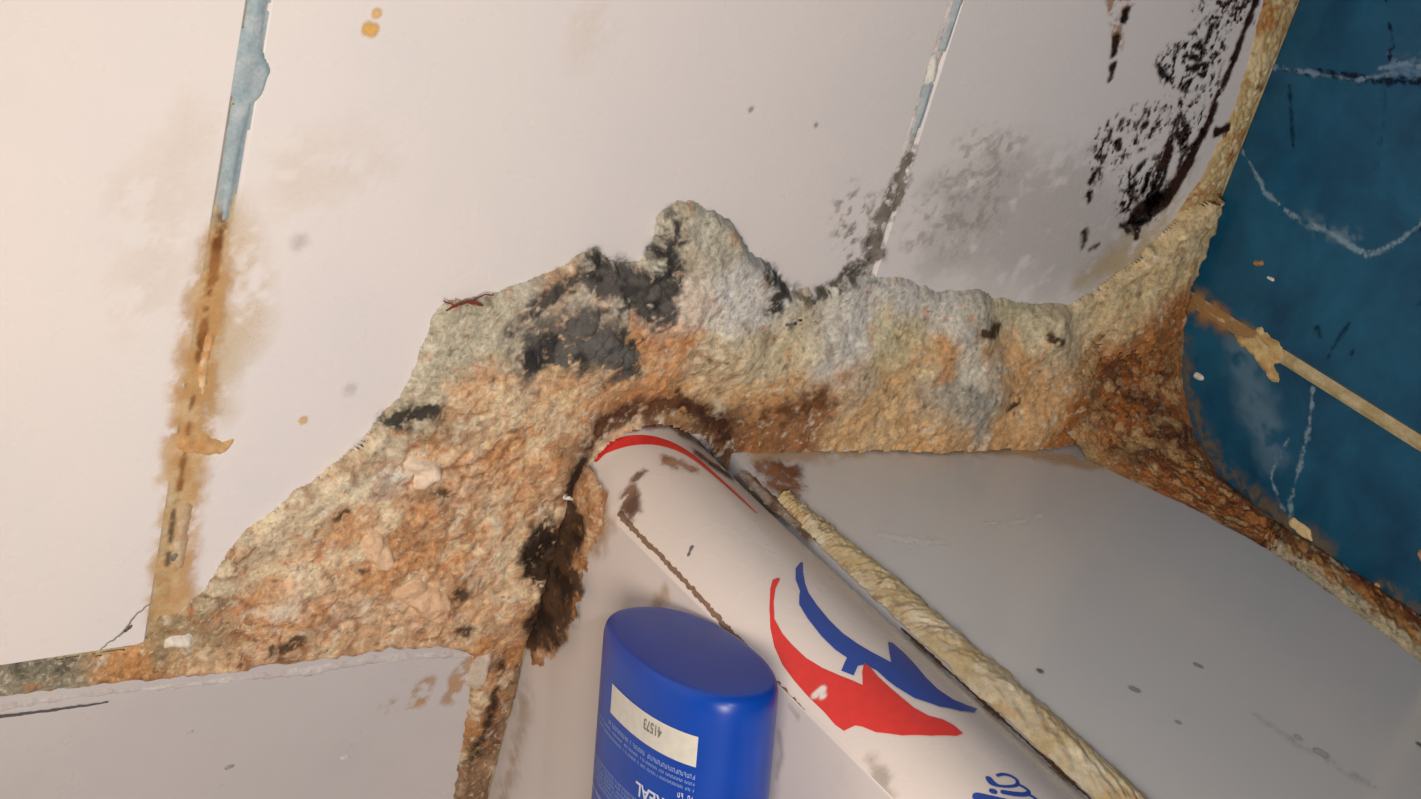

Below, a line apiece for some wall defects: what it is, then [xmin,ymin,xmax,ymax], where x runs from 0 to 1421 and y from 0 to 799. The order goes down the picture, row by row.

corrosion [152,215,247,623]
flaking render [143,349,689,690]
leakage [509,211,687,382]
leakage [518,389,733,653]
leakage [764,142,915,316]
leakage [1081,0,1259,279]
peeling [1289,517,1312,542]
leakage [471,661,505,761]